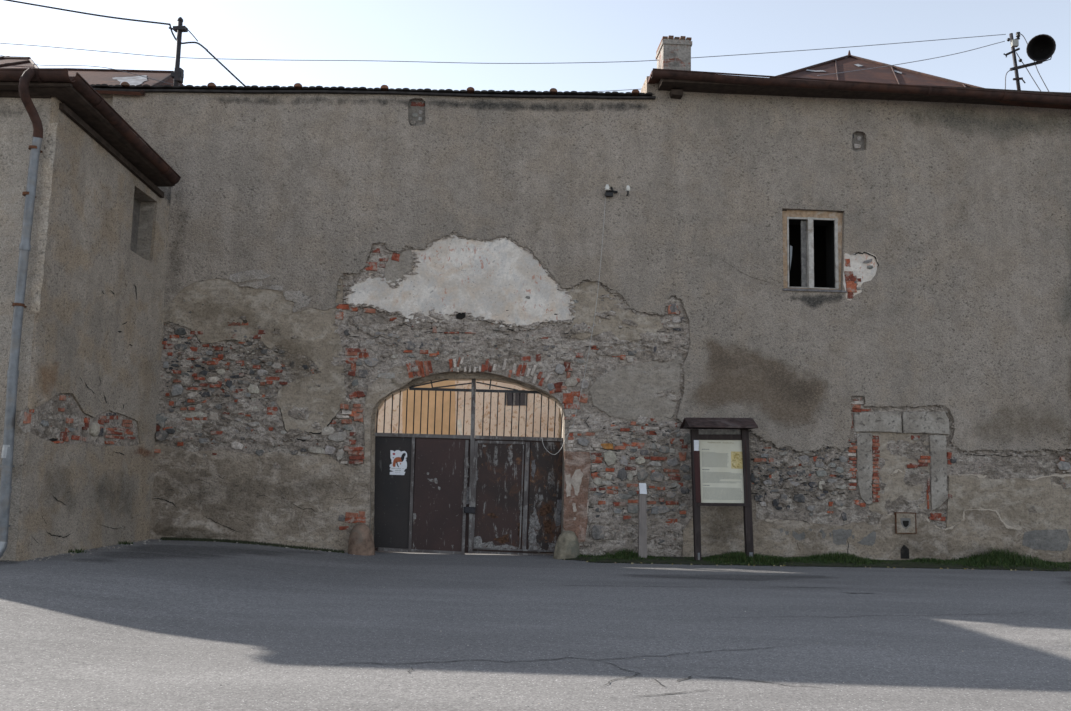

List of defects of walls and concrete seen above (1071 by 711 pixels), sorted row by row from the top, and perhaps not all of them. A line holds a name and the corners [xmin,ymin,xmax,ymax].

spalling [843,252,879,301]
spalling [16,393,139,446]
spalling [154,229,736,557]
water stain [696,342,824,422]
spalling [749,395,1071,551]